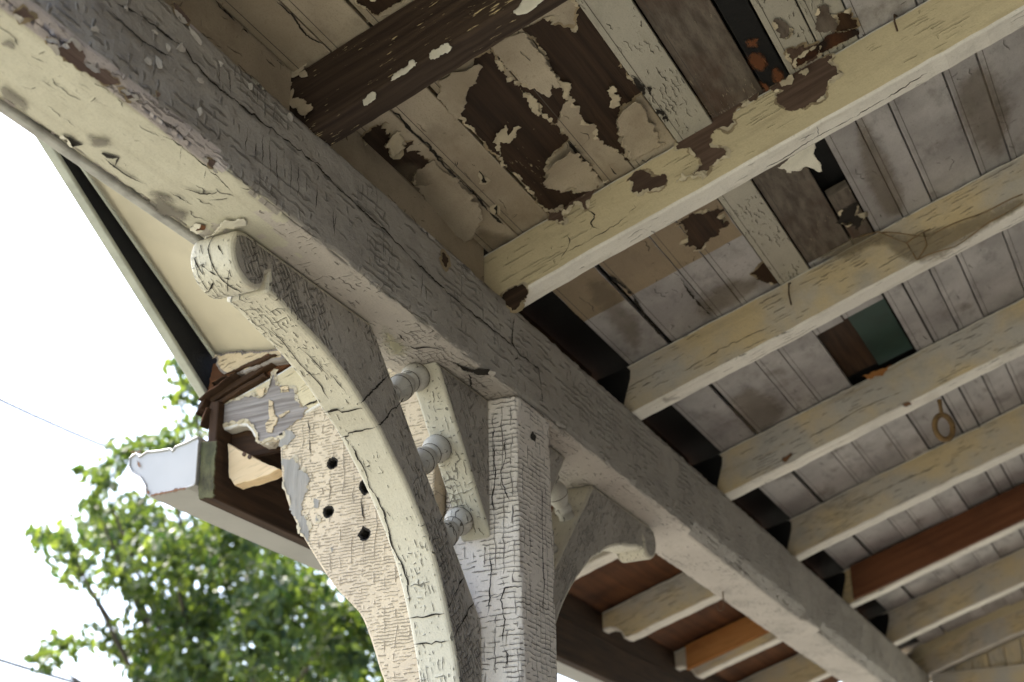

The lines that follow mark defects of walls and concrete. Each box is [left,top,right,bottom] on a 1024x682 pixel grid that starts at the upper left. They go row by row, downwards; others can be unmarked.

peeling [44,36,139,103]
peeling [355,0,405,16]
peeling [391,59,417,81]
peeling [429,43,452,59]
peeling [437,0,861,227]
crack [105,2,543,401]
peeling [360,121,500,243]
peeling [222,369,312,542]
crack [350,444,410,602]
crack [491,425,511,510]
crack [487,544,516,664]
crack [538,491,546,605]